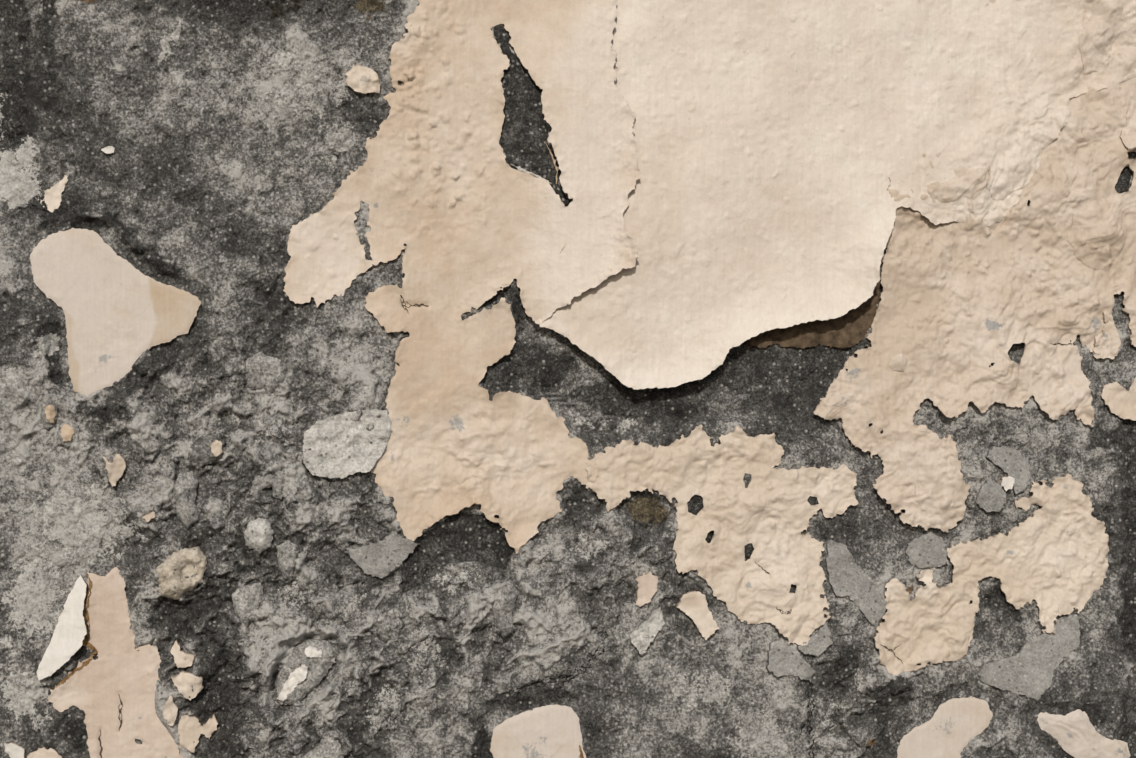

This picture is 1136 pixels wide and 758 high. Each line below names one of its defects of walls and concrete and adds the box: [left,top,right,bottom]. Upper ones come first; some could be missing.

peeling [40,175,68,212]
flaking render [30,228,201,396]
peeling [277,0,1136,758]
peeling [45,405,75,441]
peeling [210,440,223,457]
peeling [103,454,126,487]
peeling [37,567,218,758]
peeling [4,742,62,758]